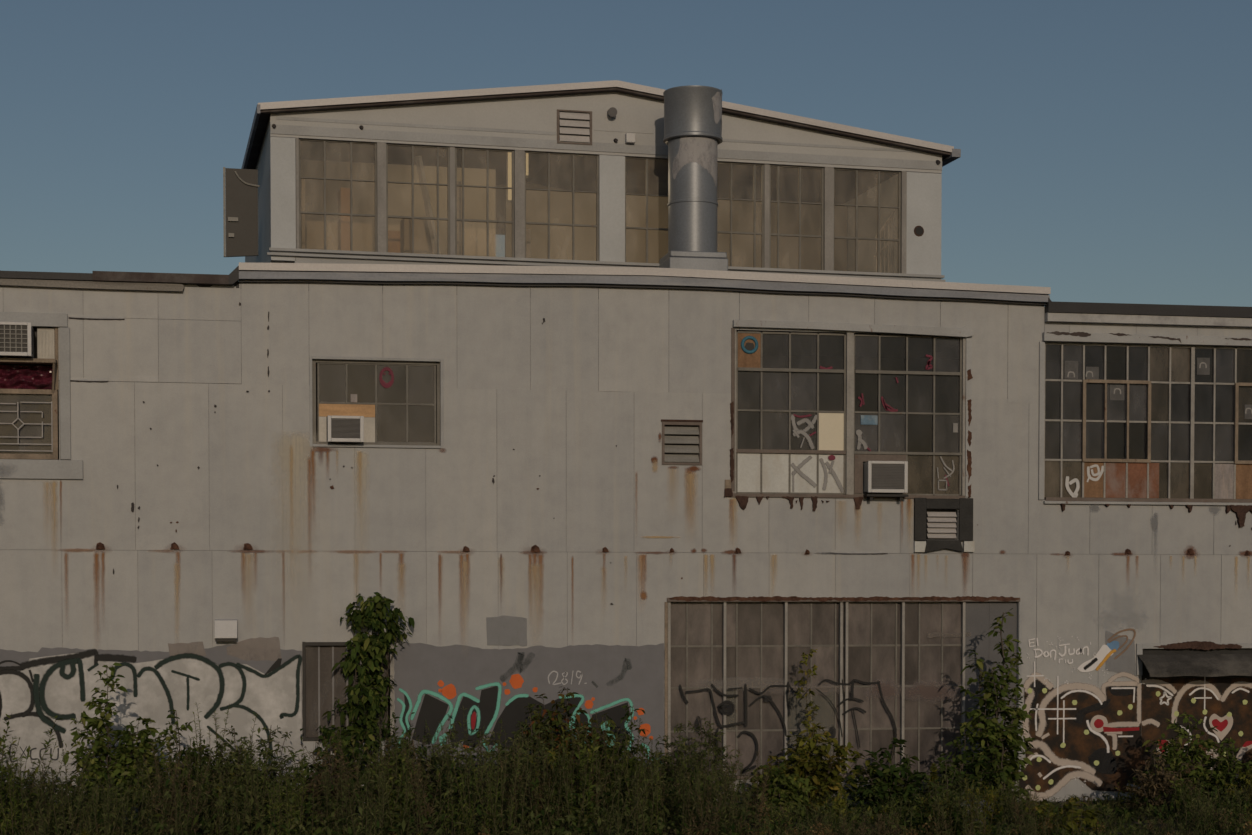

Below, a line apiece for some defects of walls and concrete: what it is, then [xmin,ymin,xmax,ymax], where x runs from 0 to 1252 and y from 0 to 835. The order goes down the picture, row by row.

corrosion [651,457,699,500]
corrosion [724,402,829,522]
corrosion [1225,505,1252,527]
corrosion [65,542,105,597]
corrosion [237,543,265,570]
corrosion [460,546,470,590]
corrosion [524,545,542,588]
corrosion [625,536,674,599]